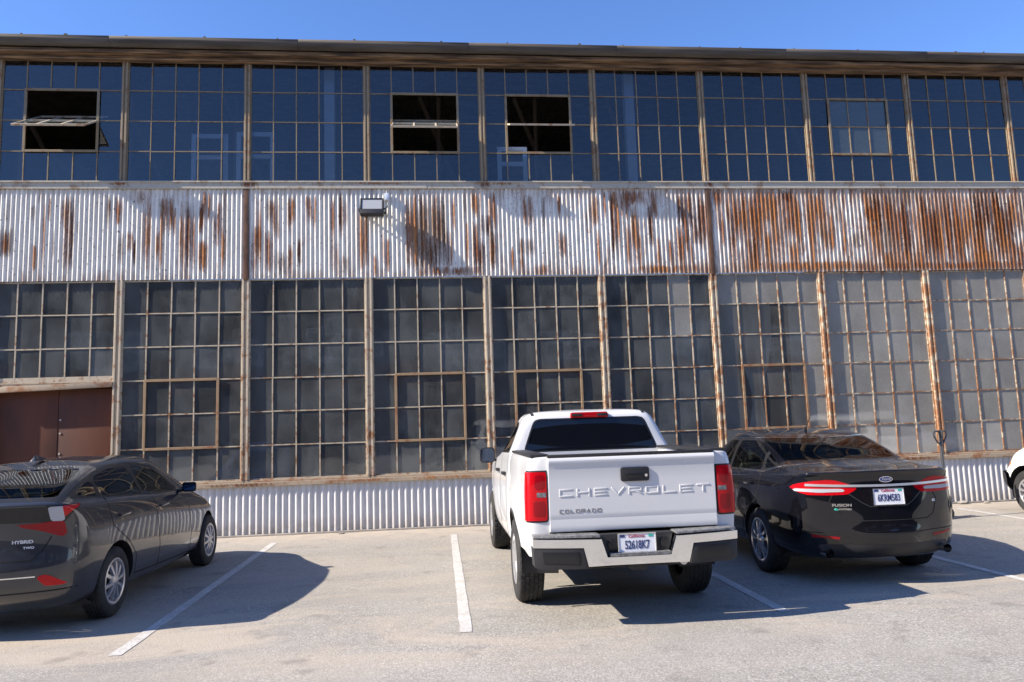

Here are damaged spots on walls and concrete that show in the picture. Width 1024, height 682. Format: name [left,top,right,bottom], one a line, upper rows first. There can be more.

corrosion [33,198,74,270]
corrosion [127,193,225,269]
corrosion [331,193,343,233]
corrosion [347,216,389,274]
corrosion [406,182,511,275]
corrosion [589,183,859,272]
corrosion [864,192,1024,269]